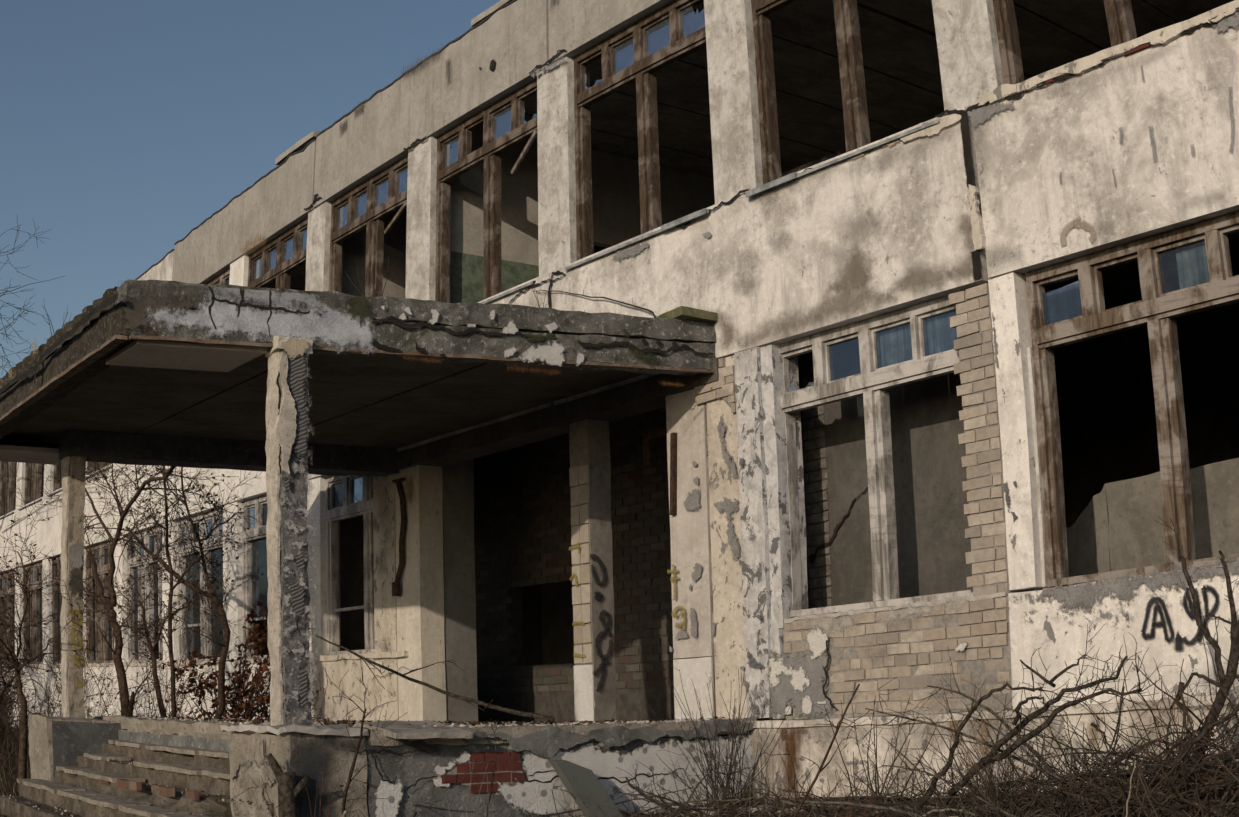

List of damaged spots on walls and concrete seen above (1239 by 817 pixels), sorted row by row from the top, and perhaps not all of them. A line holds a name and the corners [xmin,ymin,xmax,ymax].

peeling [1149,5,1239,46]
crack [208,286,310,338]
peeling [490,310,584,366]
leakage [720,217,974,345]
peeling [710,372,744,478]
peeling [147,287,401,722]
peeling [684,461,755,566]
peeling [1008,555,1239,624]
peeling [433,626,836,817]
peeling [375,779,403,817]